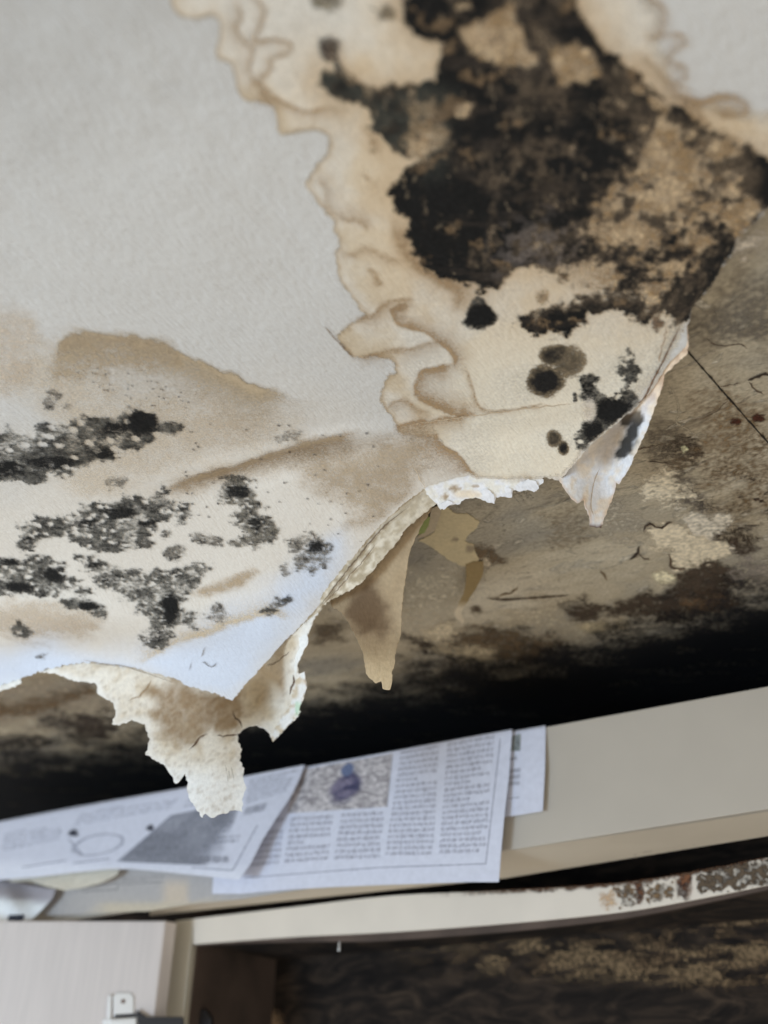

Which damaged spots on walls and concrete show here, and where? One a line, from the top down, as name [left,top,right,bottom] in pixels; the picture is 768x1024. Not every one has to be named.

damp [0,0,768,654]
peeling [559,325,689,528]
crack [688,342,768,443]
peeling [417,500,497,662]
peeling [481,479,539,504]
peeling [639,468,734,584]
peeling [0,677,113,728]
rust [469,857,768,910]